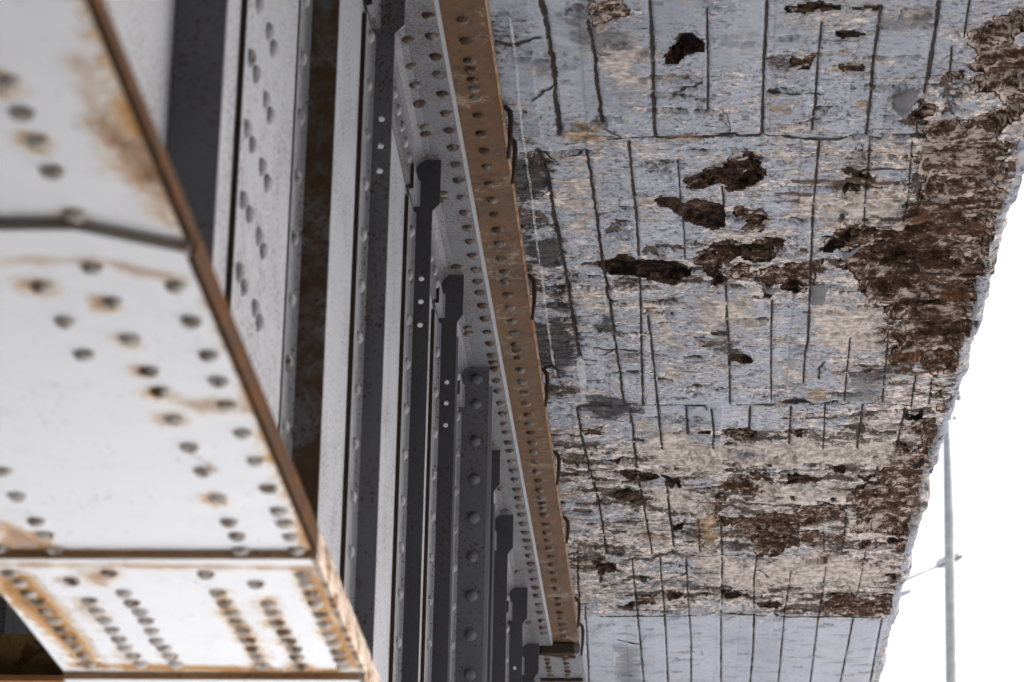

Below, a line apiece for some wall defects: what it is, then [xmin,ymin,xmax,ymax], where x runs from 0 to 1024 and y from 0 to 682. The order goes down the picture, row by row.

peeling [576,0,705,104]
corrosion [67,0,175,220]
crack [827,144,907,173]
crack [496,0,884,682]
spalling [595,0,1024,618]
crack [736,362,913,415]
spalling [579,423,603,436]
crack [912,457,925,469]
corrosion [1,523,50,550]
corrosion [283,490,313,551]
corrosion [0,566,358,673]
spalling [573,558,624,622]